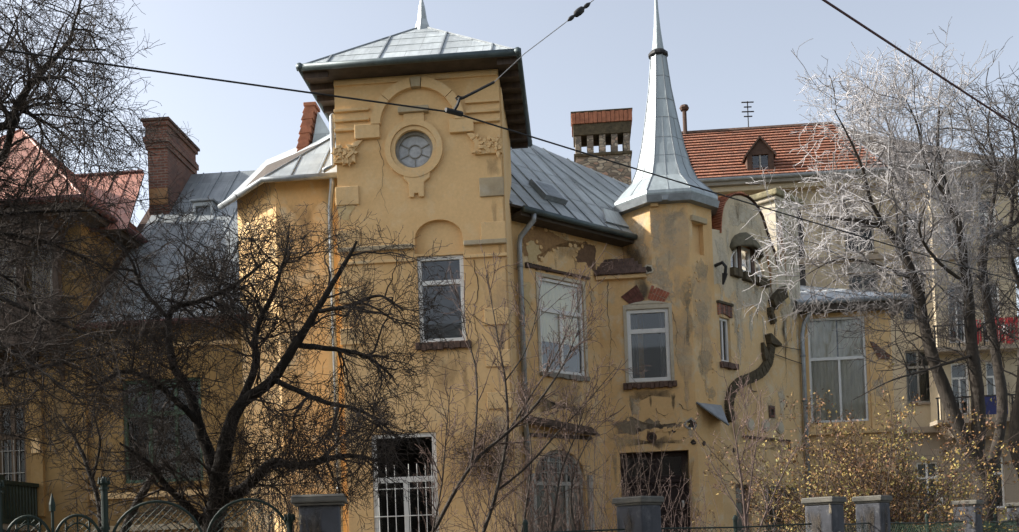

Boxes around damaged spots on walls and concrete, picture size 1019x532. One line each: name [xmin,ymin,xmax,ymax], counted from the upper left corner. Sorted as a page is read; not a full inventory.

flaking render [522,226,596,271]
flaking render [621,264,670,304]
spalling [627,417,706,446]